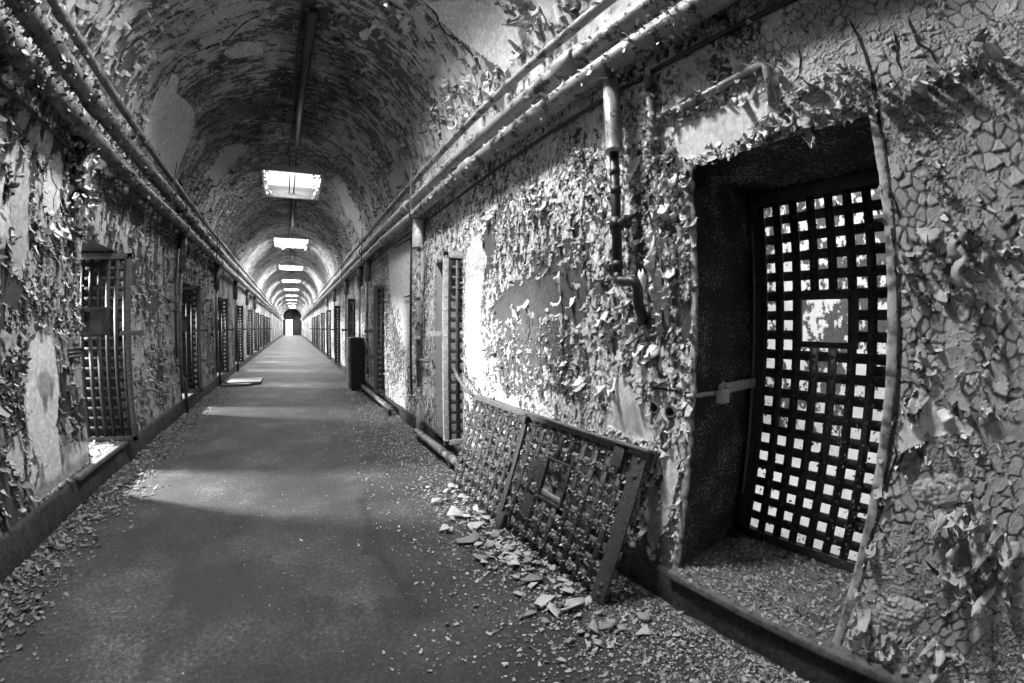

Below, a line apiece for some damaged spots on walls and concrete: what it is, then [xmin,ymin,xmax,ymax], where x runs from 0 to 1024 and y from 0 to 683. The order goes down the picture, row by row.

peeling [0,0,1014,551]
peeling [873,160,1024,624]
peeling [505,419,633,589]
peeling [855,532,885,577]
peeling [846,592,965,683]
peeling [986,647,1024,671]